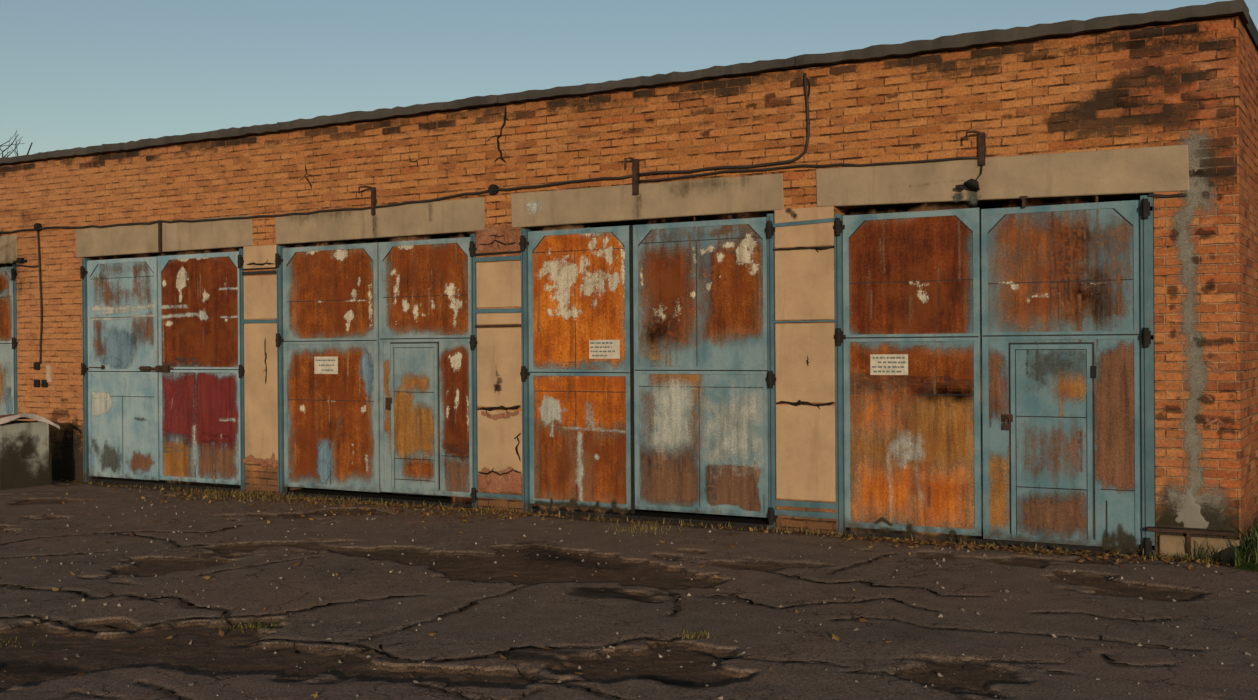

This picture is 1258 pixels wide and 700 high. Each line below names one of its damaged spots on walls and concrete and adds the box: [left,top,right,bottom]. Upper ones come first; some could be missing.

crack [486,105,509,163]
corrosion [94,250,238,373]
corrosion [288,237,470,501]
peeling [390,268,467,325]
peeling [536,233,625,320]
corrosion [533,216,763,513]
peeling [654,233,759,321]
corrosion [849,207,1088,542]
corrosion [988,195,1135,490]
peeling [540,397,626,501]
crack [0,525,621,700]
crack [589,553,1187,700]